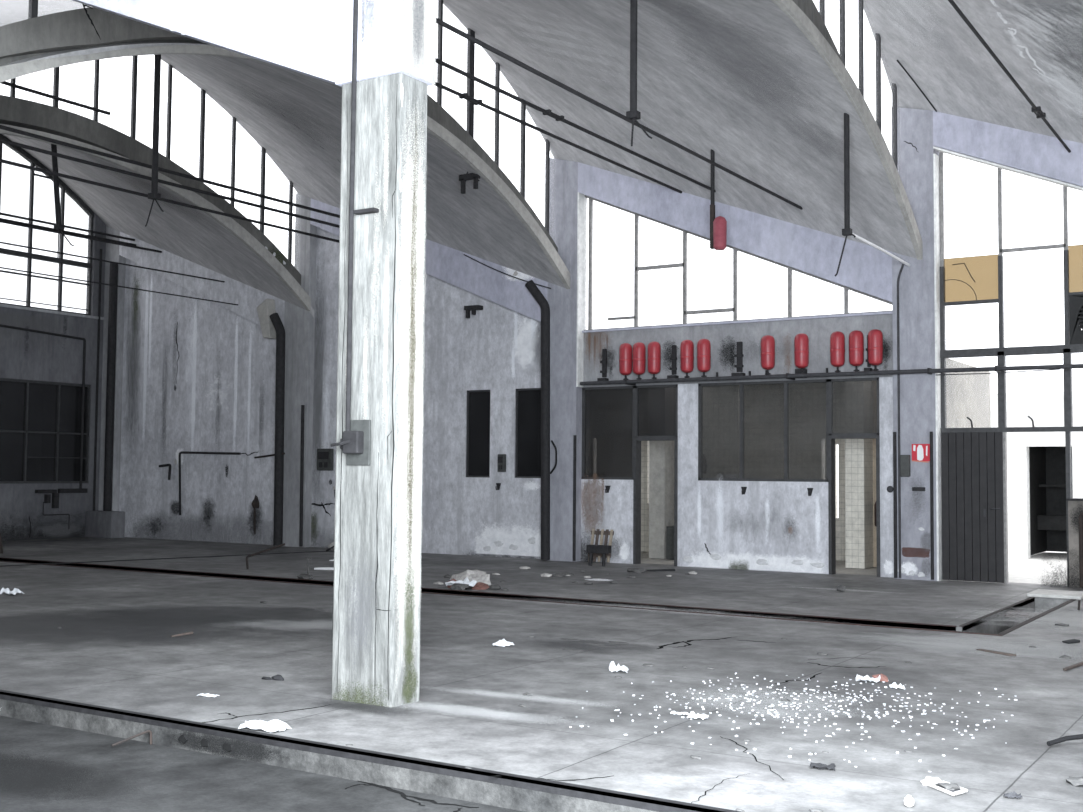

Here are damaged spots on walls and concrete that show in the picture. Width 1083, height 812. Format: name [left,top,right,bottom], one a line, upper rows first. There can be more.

damp [0,98,614,717]
damp [1037,543,1083,588]
crack [657,637,773,649]
crack [691,736,784,803]
crack [345,781,479,812]